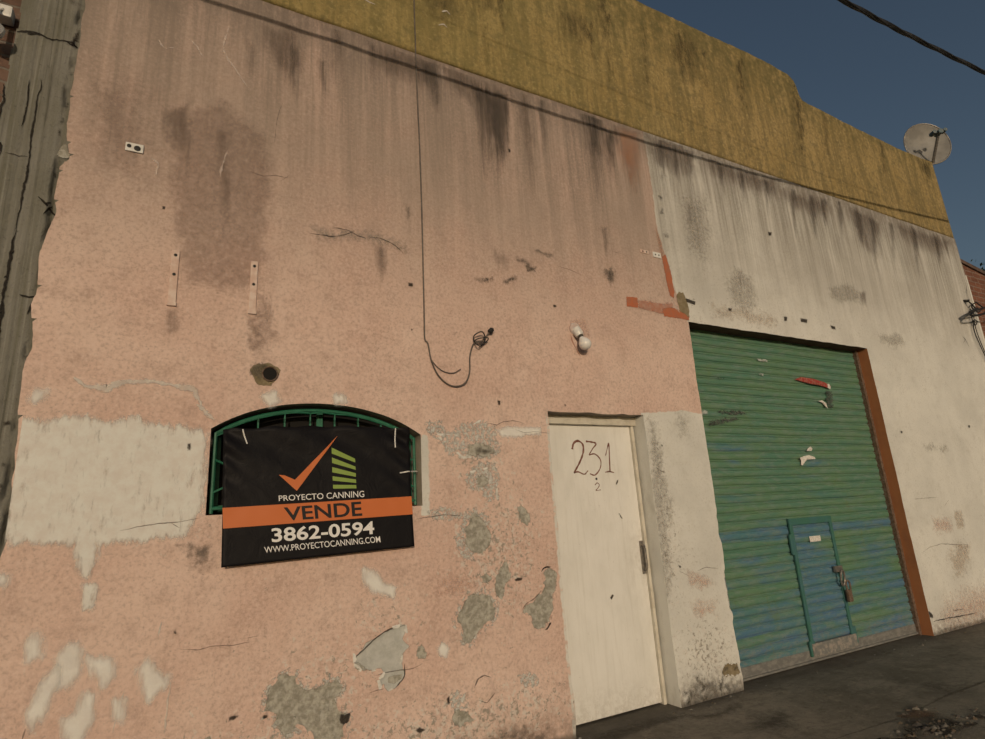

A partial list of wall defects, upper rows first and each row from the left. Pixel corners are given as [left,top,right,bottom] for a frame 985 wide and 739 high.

crack [73,377,215,420]
peeling [426,420,541,502]
spalling [427,507,492,561]
peeling [362,567,396,598]
spalling [452,561,522,647]
spalling [523,566,557,630]
peeling [353,624,449,691]
spalling [260,669,353,739]